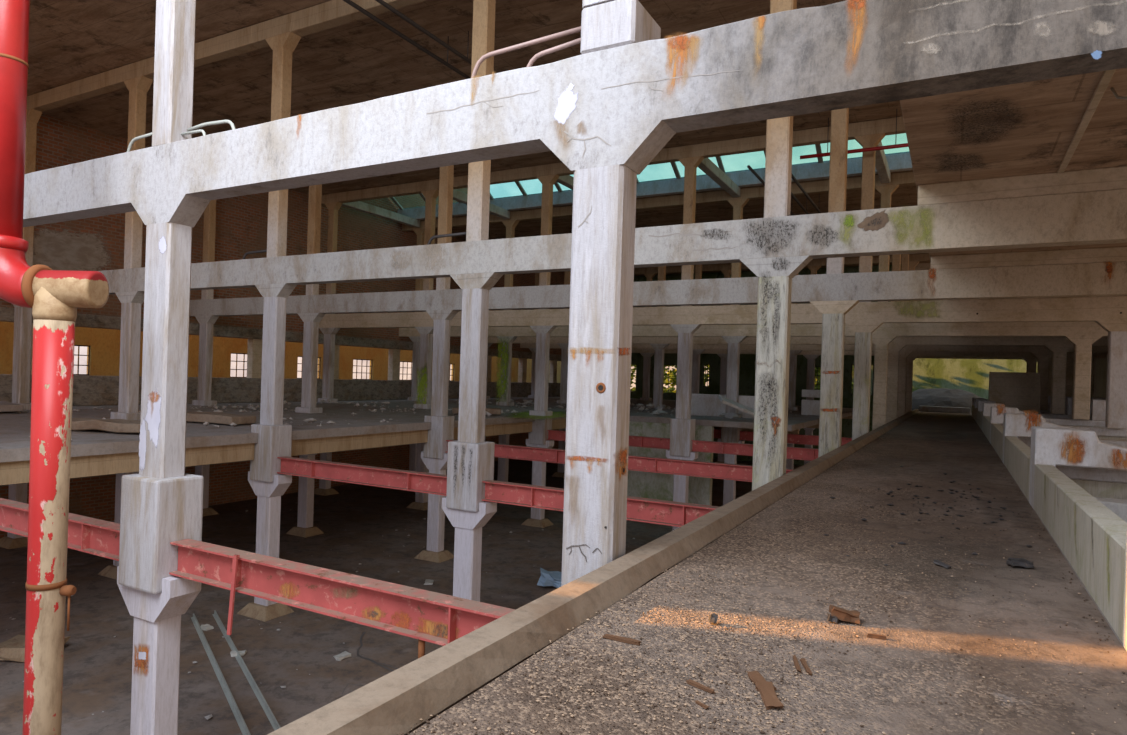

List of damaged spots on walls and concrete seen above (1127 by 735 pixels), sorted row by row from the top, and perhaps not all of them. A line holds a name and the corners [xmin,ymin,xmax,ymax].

corrosion [667,35,699,87]
corrosion [756,16,765,61]
corrosion [849,0,864,59]
peeling [554,83,578,124]
peeling [159,236,167,254]
mould [809,228,838,246]
mould [748,221,796,342]
peeling [139,391,162,470]
corrosion [568,449,628,478]
leakage [758,360,779,456]
corrosion [1061,434,1085,463]
corrosion [134,645,149,674]